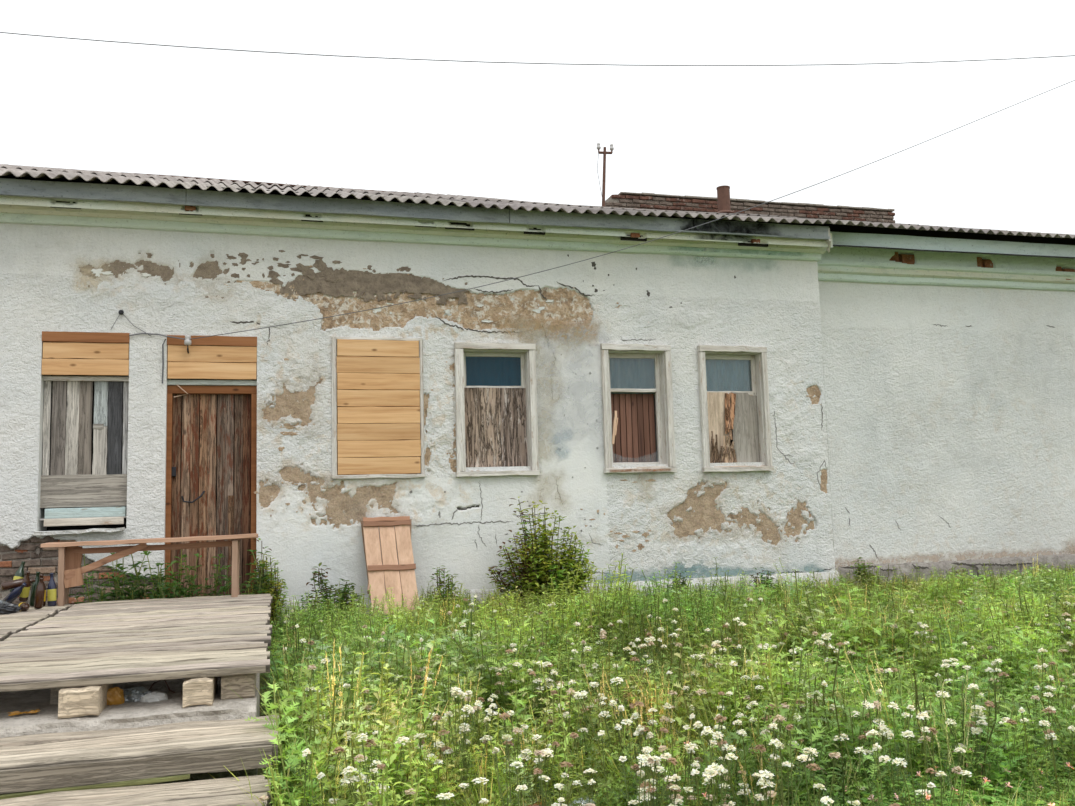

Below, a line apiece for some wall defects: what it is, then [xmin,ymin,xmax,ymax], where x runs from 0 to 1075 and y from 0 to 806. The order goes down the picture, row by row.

spalling [79,250,605,335]
spalling [262,377,323,451]
spalling [806,384,822,405]
spalling [254,463,398,530]
spalling [667,480,814,546]
spalling [0,536,162,607]